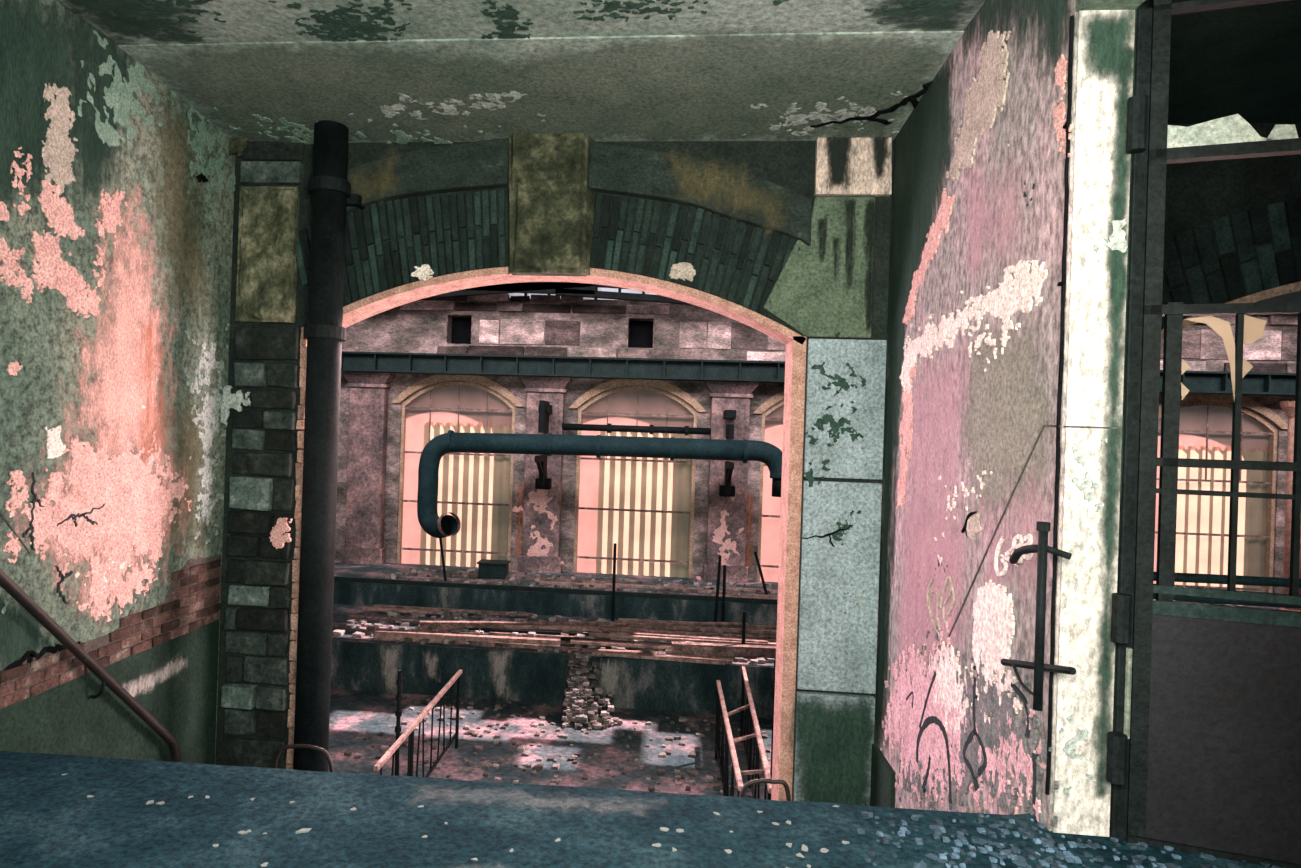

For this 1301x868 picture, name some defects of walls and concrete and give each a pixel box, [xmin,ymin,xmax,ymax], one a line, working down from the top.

peeling [187,106,318,225]
crack [810,81,932,127]
peeling [1052,54,1073,157]
peeling [897,30,1048,509]
peeling [0,30,251,709]
water stain [0,0,1070,806]
water stain [1085,9,1137,797]
crack [22,472,105,604]
spalling [512,489,564,565]
spalling [712,495,744,566]
peeling [1071,440,1104,512]
peeling [879,579,1096,868]